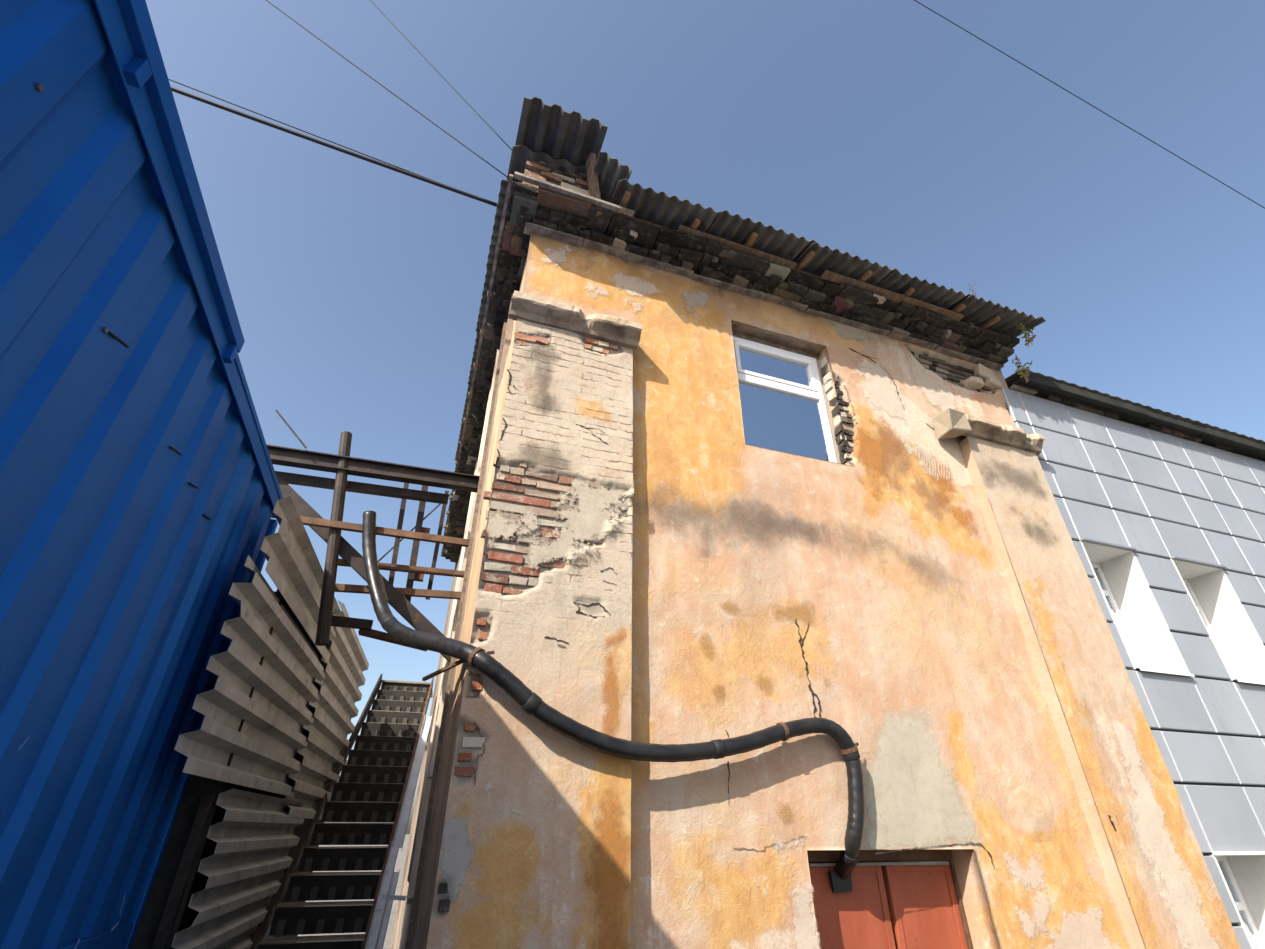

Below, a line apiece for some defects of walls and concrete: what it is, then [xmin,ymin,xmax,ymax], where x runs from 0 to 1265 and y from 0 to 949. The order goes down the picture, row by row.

peeling [542,245,572,265]
peeling [586,273,659,312]
spalling [514,332,553,347]
spalling [584,337,623,355]
spalling [820,357,860,464]
peeling [857,362,951,481]
spalling [904,344,1003,411]
spalling [480,463,634,595]
spalling [476,613,492,641]
crack [778,607,821,718]
spalling [454,722,486,785]
peeling [1004,852,1121,949]